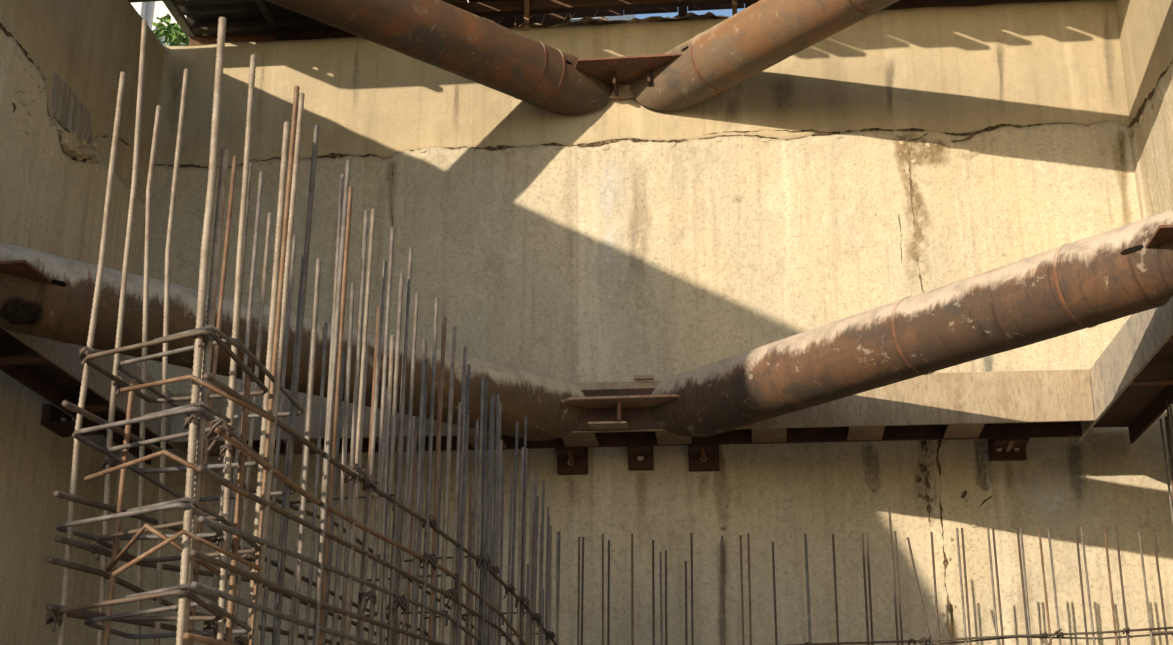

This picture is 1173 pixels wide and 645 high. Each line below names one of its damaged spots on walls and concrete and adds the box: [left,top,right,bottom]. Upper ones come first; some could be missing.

spalling [52,72,100,163]
crack [155,58,1173,293]
damp [916,440,933,525]
crack [930,440,992,634]